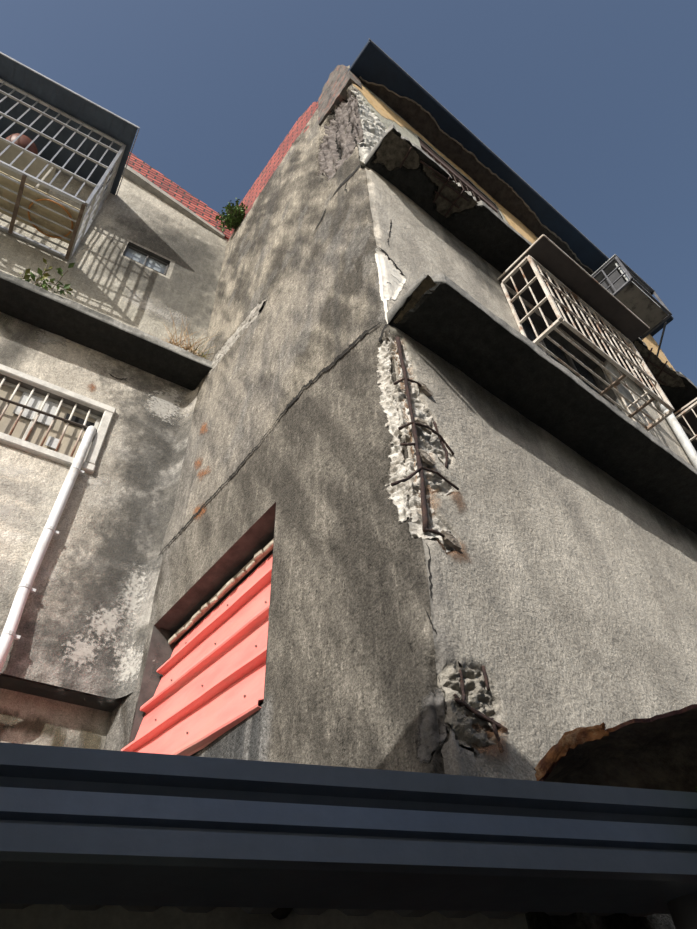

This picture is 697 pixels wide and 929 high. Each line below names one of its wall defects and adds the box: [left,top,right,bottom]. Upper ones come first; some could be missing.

spalling [318,76,594,273]
damp [35,365,188,682]
crack [159,322,388,555]
spalling [376,331,467,558]
damp [0,712,65,747]
spalling [436,661,508,756]